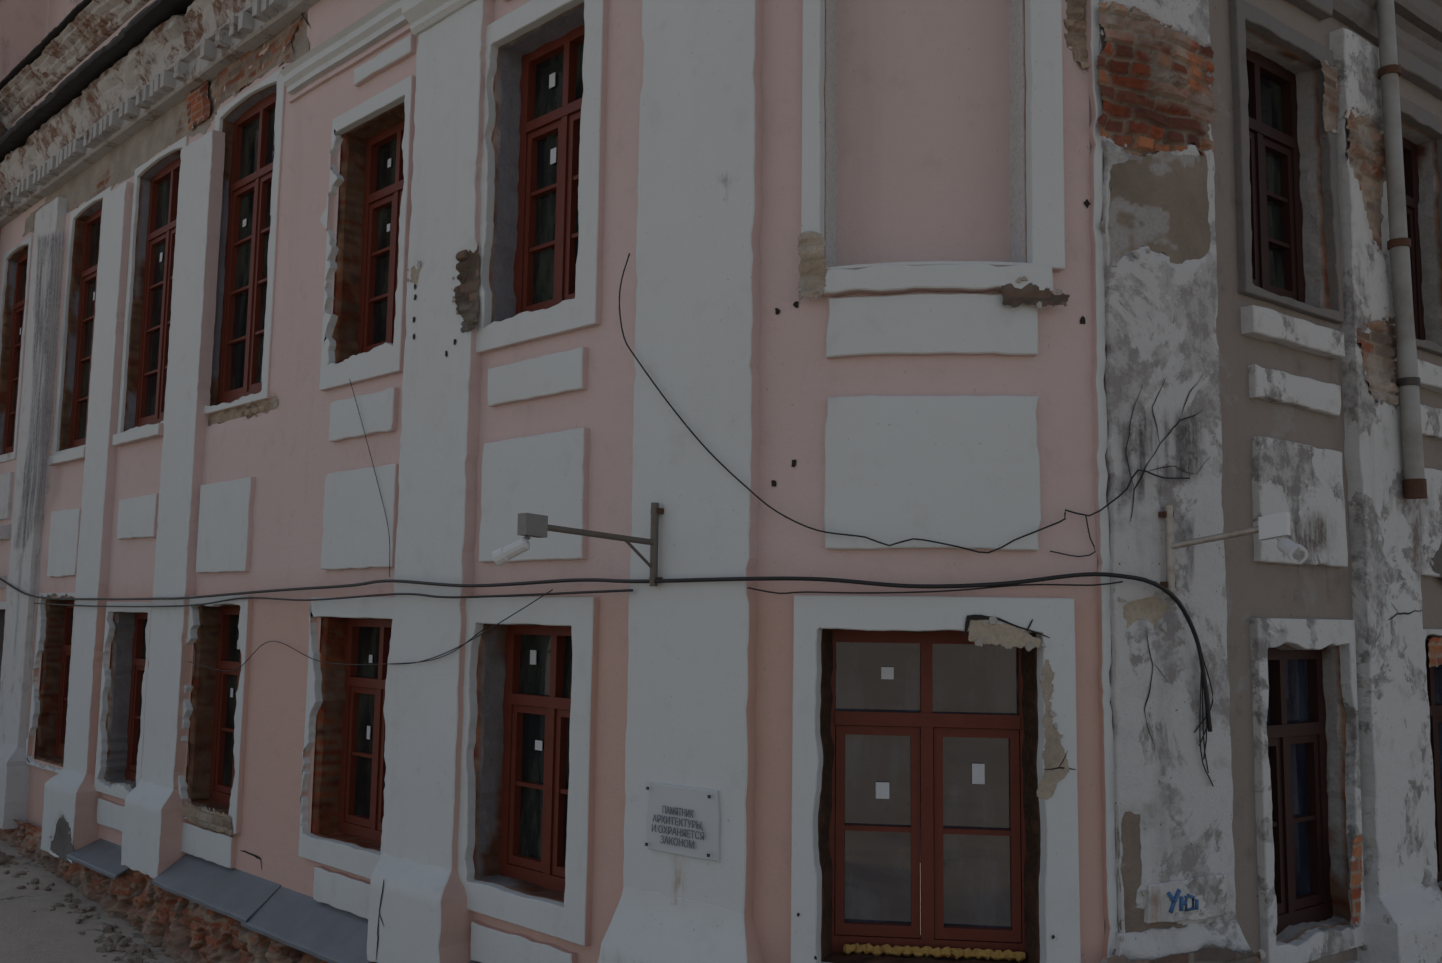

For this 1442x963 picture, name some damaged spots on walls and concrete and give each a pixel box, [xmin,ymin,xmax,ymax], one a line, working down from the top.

flaking render [22,13,310,237]
flaking render [1064,0,1218,270]
flaking render [1320,60,1386,251]
flaking render [445,245,480,357]
flaking render [775,231,828,315]
flaking render [1357,316,1400,407]
flaking render [968,616,1070,800]
flaking render [1107,802,1266,963]